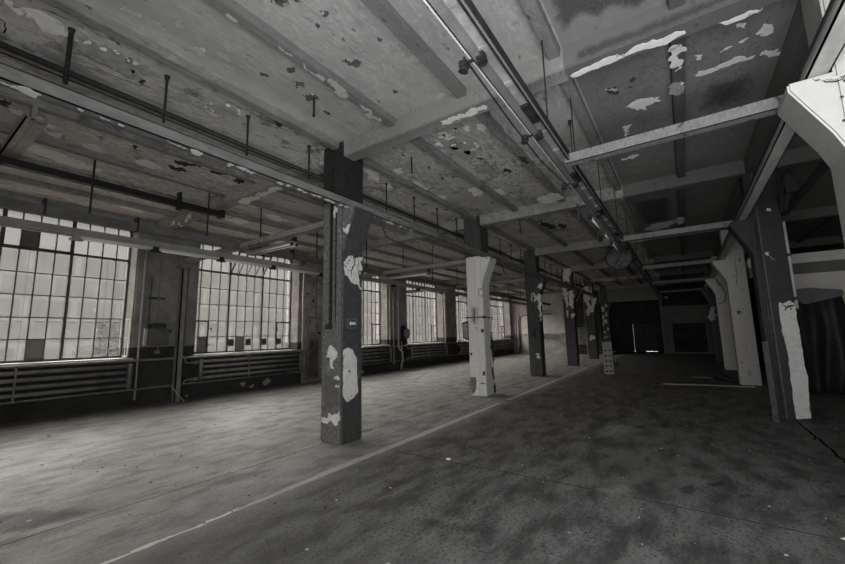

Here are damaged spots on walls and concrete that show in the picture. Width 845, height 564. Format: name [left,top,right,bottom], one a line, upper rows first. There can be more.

peeling [721,7,763,28]
peeling [570,31,687,78]
peeling [696,49,780,77]
peeling [720,24,774,53]
peeling [627,97,661,110]
peeling [344,256,363,290]
peeling [531,283,543,321]
peeling [561,268,637,341]
peeling [326,345,358,402]
peeling [779,300,811,419]
peeling [321,411,341,426]
crack [794,420,845,463]